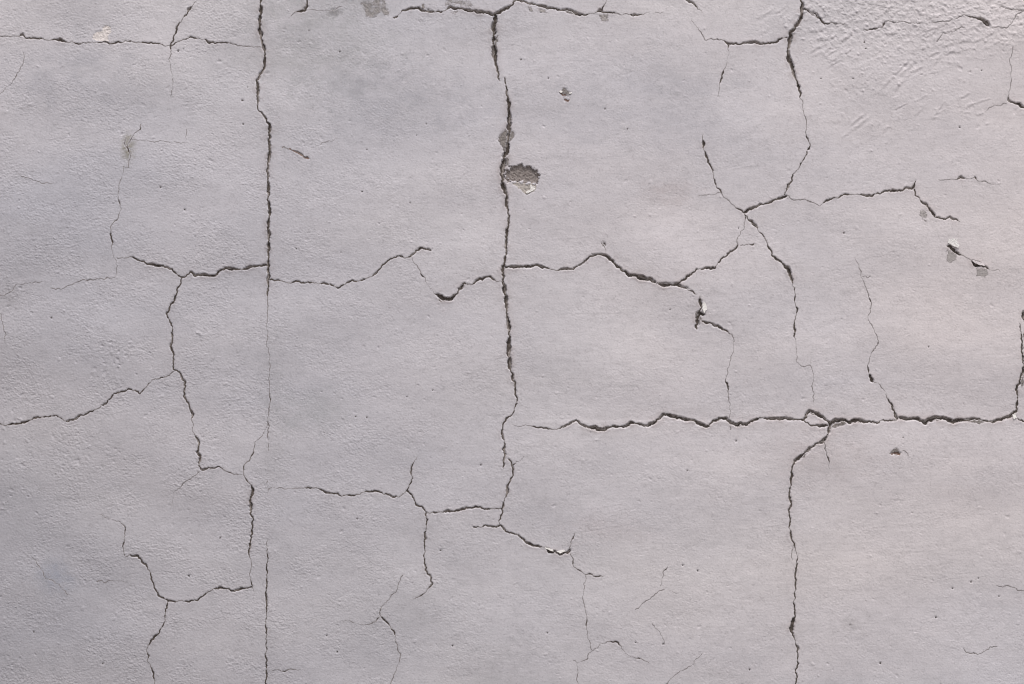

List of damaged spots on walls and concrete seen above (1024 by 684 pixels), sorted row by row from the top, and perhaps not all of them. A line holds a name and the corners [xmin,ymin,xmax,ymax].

crack [0,0,432,684]
spalling [505,164,540,194]
crack [304,0,1024,684]
peeling [947,238,999,277]